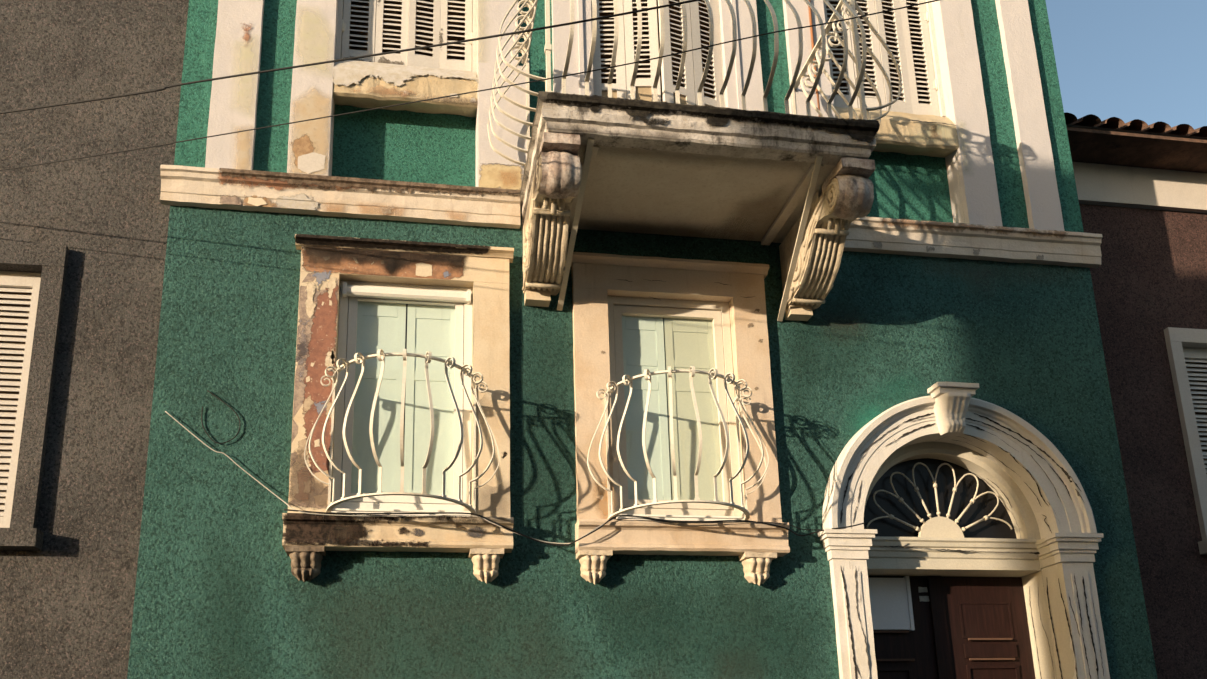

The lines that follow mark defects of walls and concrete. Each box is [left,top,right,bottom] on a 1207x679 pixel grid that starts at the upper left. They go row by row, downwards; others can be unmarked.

peeling [218,91,358,210]
peeling [333,56,478,103]
leakage [625,104,668,139]
leakage [704,114,730,126]
leakage [842,118,879,143]
peeling [288,247,464,509]
leakage [281,513,506,547]
crack [840,413,1084,554]
crack [841,561,870,679]
crack [1029,575,1104,679]